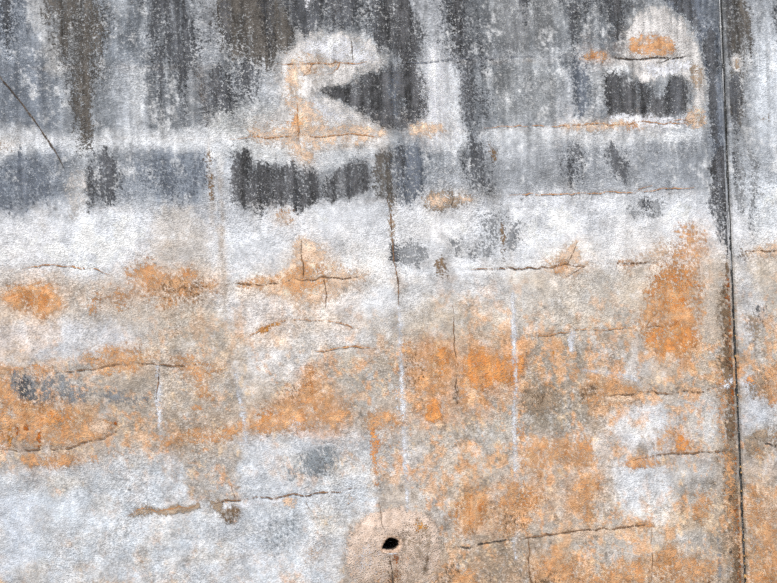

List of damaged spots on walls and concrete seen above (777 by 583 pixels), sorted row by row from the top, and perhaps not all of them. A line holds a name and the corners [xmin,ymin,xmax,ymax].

crack [0,77,64,168]
leakage [40,0,123,213]
leakage [138,0,497,278]
leakage [602,70,688,118]
leakage [664,0,761,257]
crack [225,240,371,353]
corrosion [237,235,369,309]
corrosion [617,222,707,363]
crack [128,485,351,516]
corrosion [400,340,654,543]
crack [457,522,654,583]
corrosion [526,257,777,583]